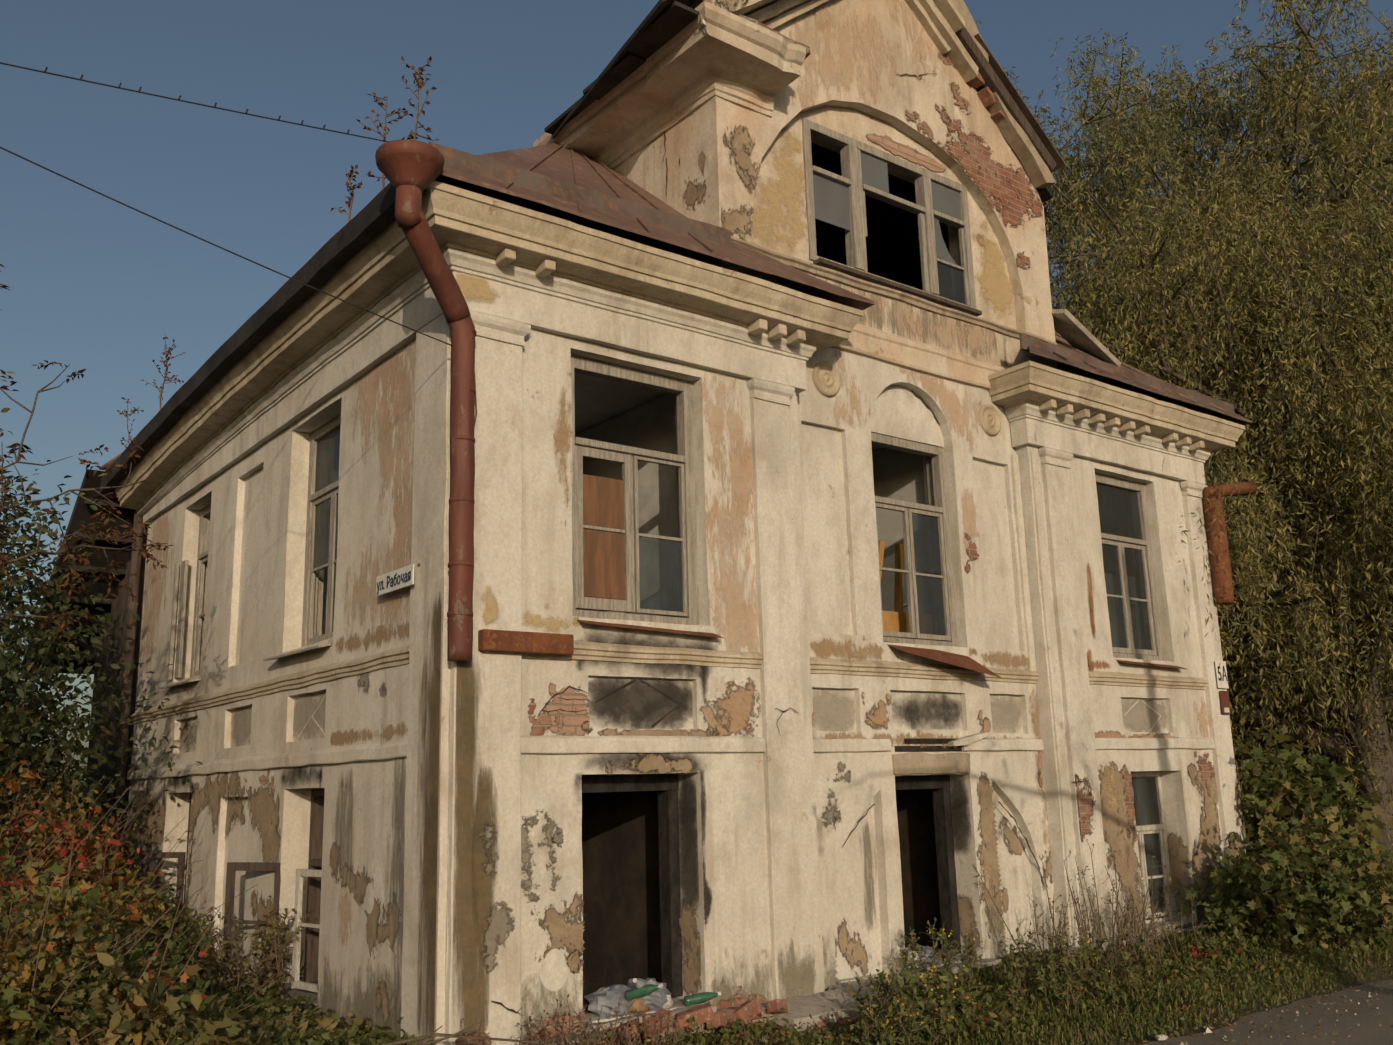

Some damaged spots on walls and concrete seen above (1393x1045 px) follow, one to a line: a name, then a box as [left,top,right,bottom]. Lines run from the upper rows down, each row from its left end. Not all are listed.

flaking render [683,151,707,210]
flaking render [721,125,761,241]
flaking render [847,52,1043,354]
flaking render [329,840,399,958]
damp [316,593,497,1042]
flaking render [479,811,585,974]
flaking render [528,678,761,737]
flaking render [605,753,692,775]
flaking render [835,919,872,975]
flaking render [958,772,1053,952]
flaking render [1076,761,1141,931]
flaking render [1167,702,1247,917]